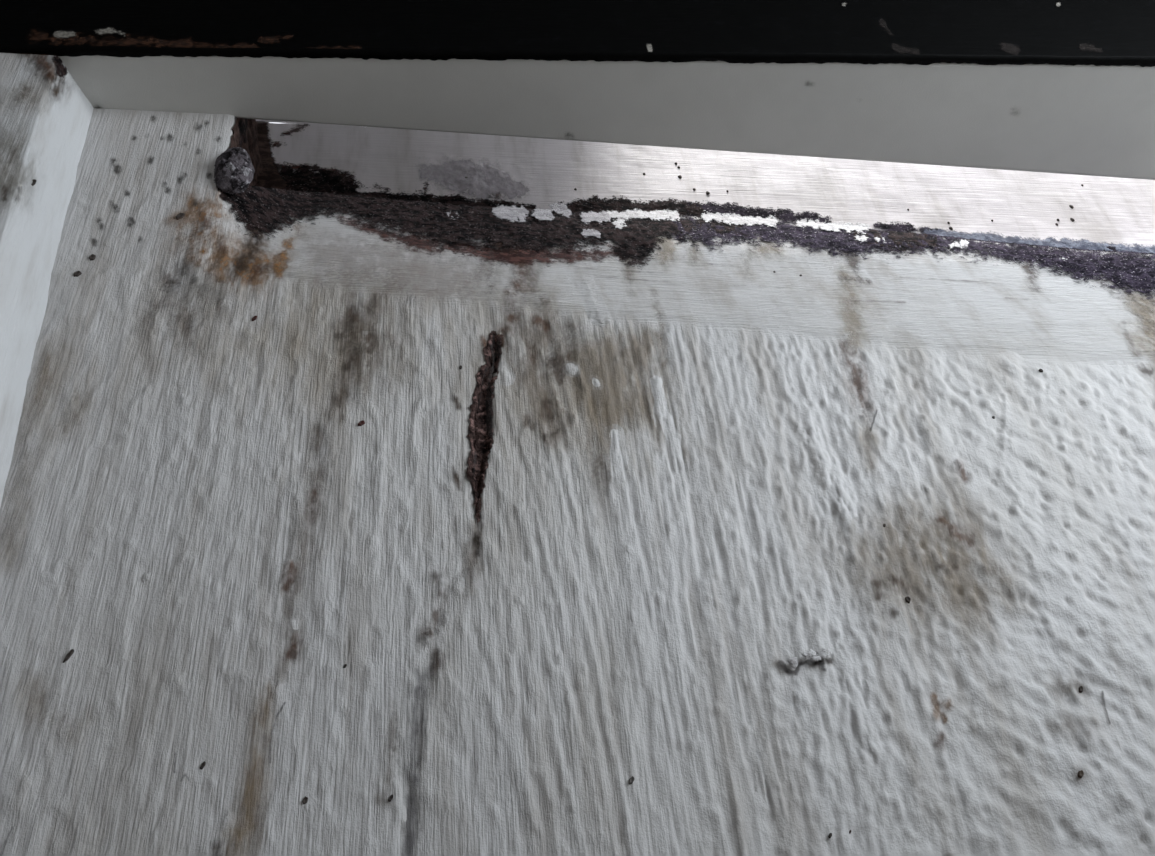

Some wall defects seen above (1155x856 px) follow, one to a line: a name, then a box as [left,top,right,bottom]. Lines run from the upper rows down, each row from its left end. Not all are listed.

peeling [421,161,528,199]
corrosion [176,197,292,285]
water stain [406,775,416,856]